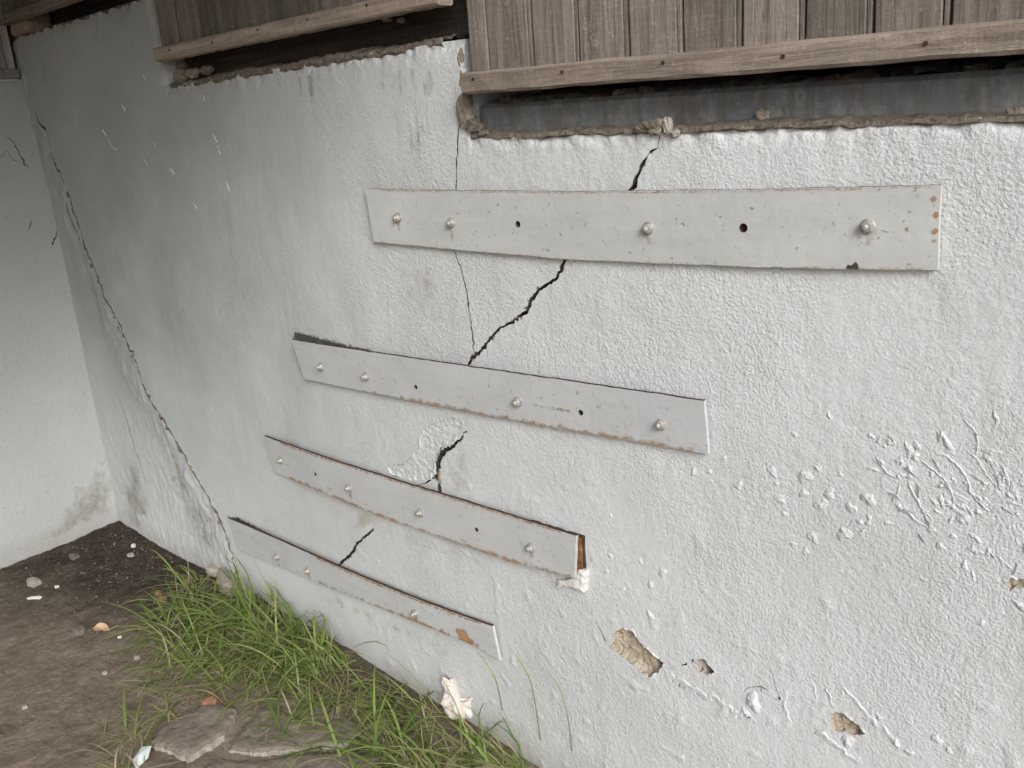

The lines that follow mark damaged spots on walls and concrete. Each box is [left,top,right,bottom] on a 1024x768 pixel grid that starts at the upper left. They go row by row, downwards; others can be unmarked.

crack [628,137,660,191]
crack [29,93,237,574]
crack [454,250,568,365]
peeling [387,417,463,481]
crack [420,431,467,492]
rust [521,420,665,447]
crack [338,528,374,565]
rust [290,478,522,565]
rust [317,557,481,647]
spalling [609,627,663,681]
spalling [681,659,718,677]
spalling [829,710,870,737]